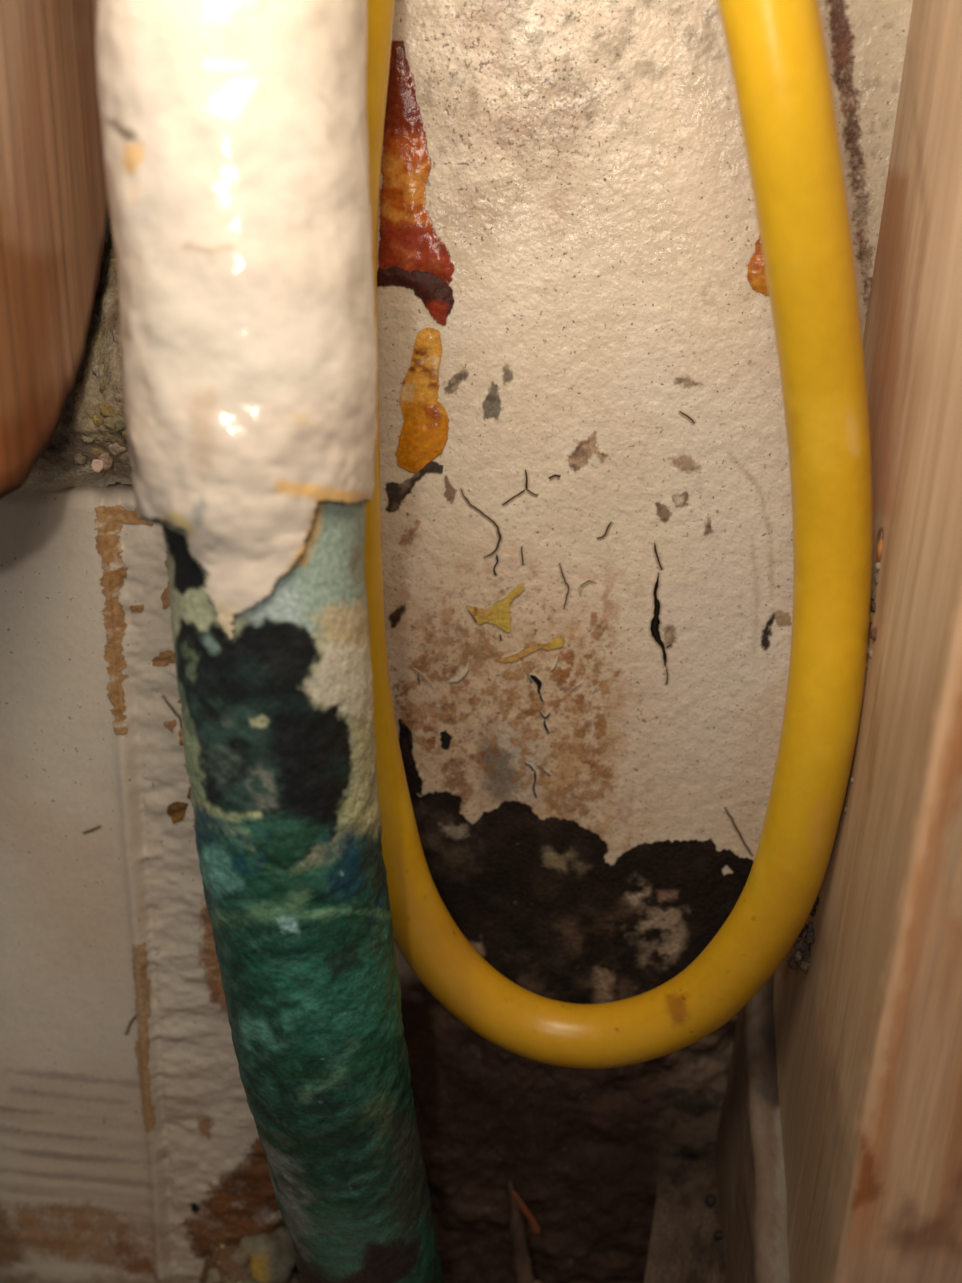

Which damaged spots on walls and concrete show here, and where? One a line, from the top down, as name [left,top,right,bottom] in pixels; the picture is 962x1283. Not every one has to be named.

corrosion [377,40,454,473]
corrosion [747,236,769,296]
peeling [482,364,513,419]
peeling [385,461,457,512]
crack [459,469,561,577]
peeling [568,431,608,471]
peeling [94,505,153,735]
crack [557,562,571,610]
crack [648,542,673,685]
peeling [761,611,792,650]
water stain [394,612,754,1004]
water stain [182,1139,286,1258]